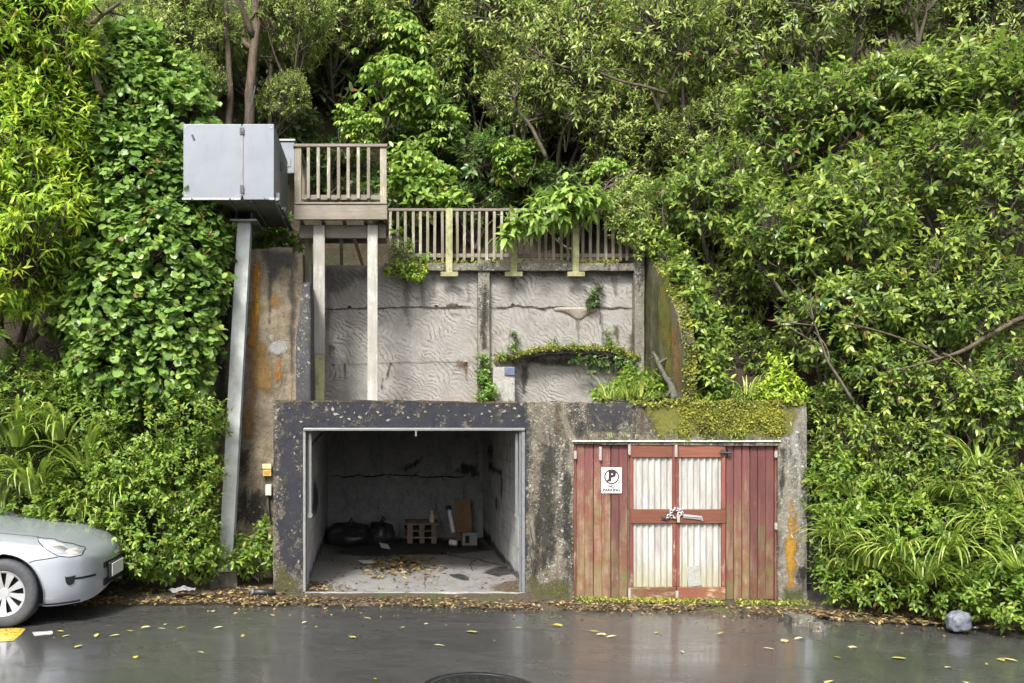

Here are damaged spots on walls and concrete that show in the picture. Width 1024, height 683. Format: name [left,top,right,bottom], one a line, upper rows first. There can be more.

corrosion [244,263,282,437]
crack [325,303,566,317]
crack [592,306,629,322]
leakage [644,276,672,384]
crack [334,471,464,480]
leakage [532,404,585,575]
corrosion [785,500,798,588]